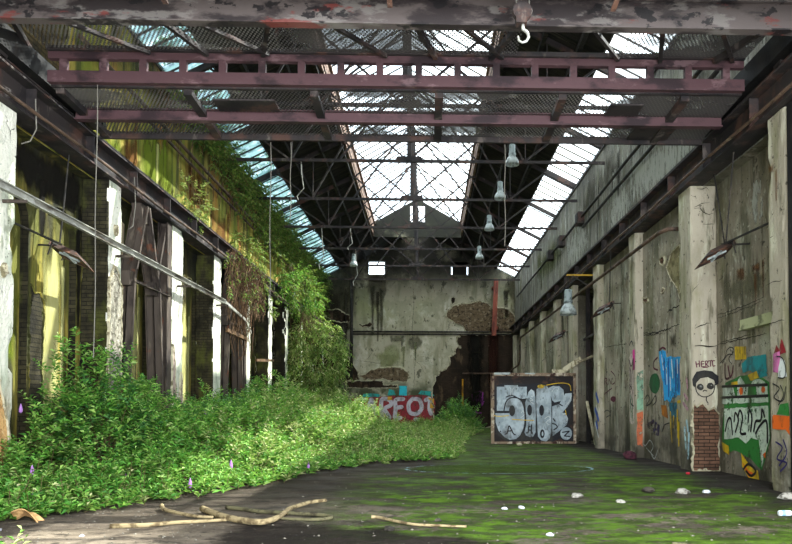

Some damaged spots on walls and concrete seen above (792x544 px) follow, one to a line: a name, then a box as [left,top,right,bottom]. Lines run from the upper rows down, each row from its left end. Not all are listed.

water stain [368,275,386,341]
flaking render [25,283,45,417]
flaking render [323,334,409,389]
water stain [390,336,422,367]
flaking render [430,297,515,428]
flaking render [0,379,14,478]
flaking render [690,402,720,471]